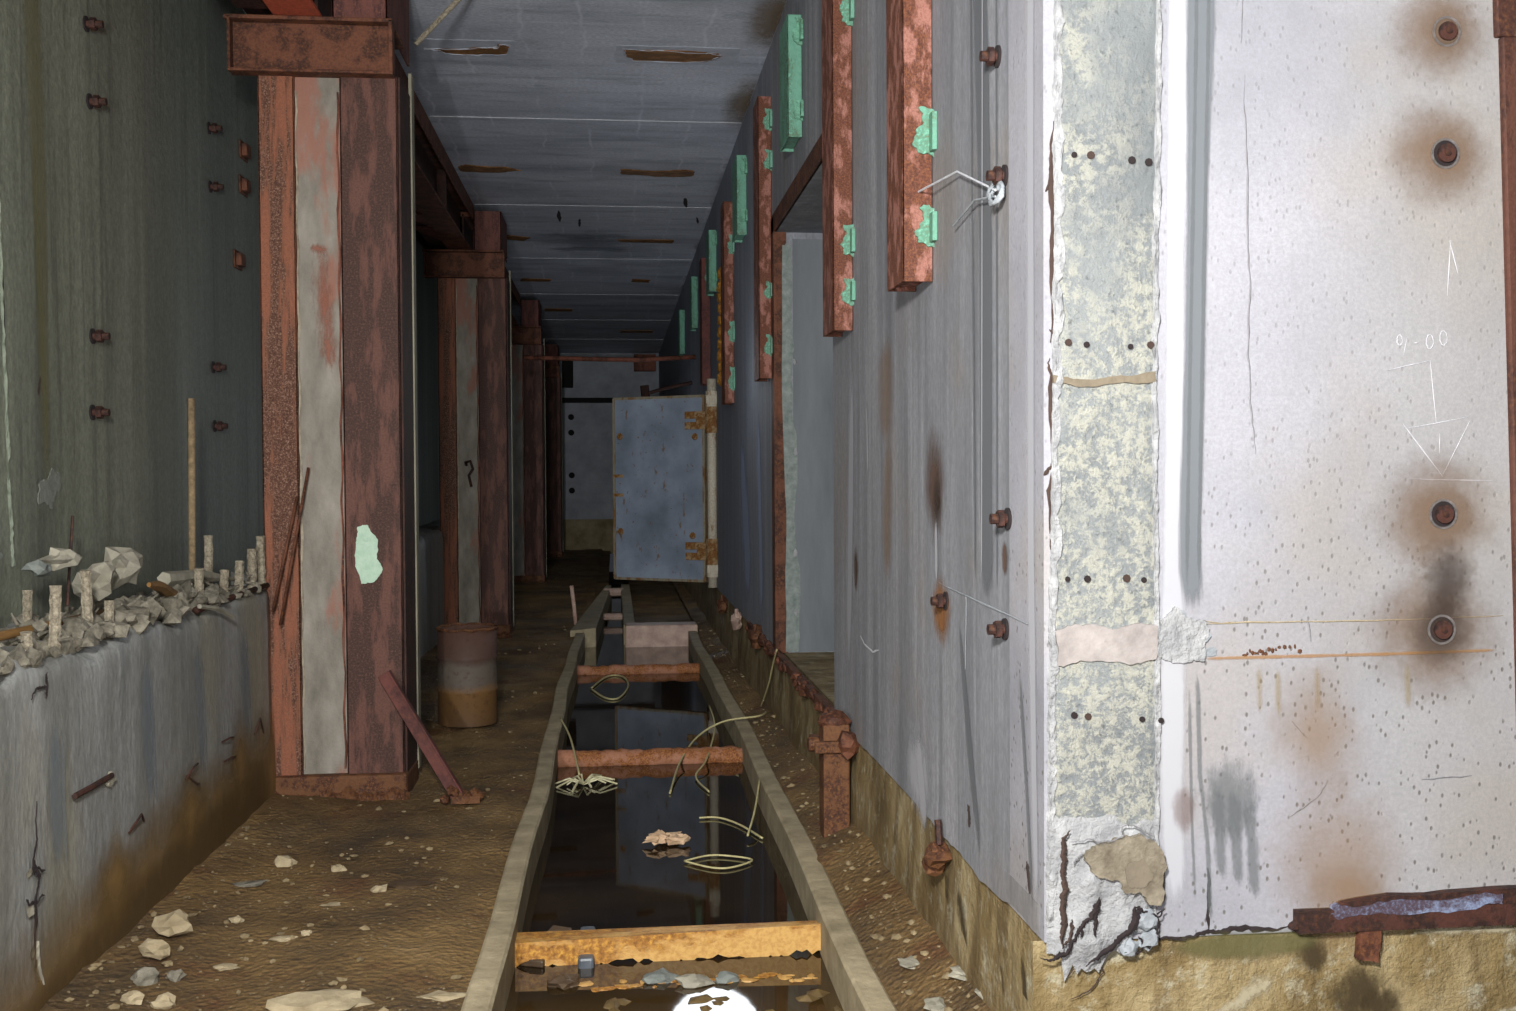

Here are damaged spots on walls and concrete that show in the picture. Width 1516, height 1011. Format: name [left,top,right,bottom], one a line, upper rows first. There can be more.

peeling [614,45,740,66]
corrosion [1405,127,1469,182]
corrosion [312,245,335,364]
peeling [37,468,61,509]
spalling [836,0,1167,936]
corrosion [1408,490,1470,549]
spalling [0,570,115,651]
corrosion [1211,563,1489,669]
crack [26,801,46,985]
crack [1040,825,1288,1000]